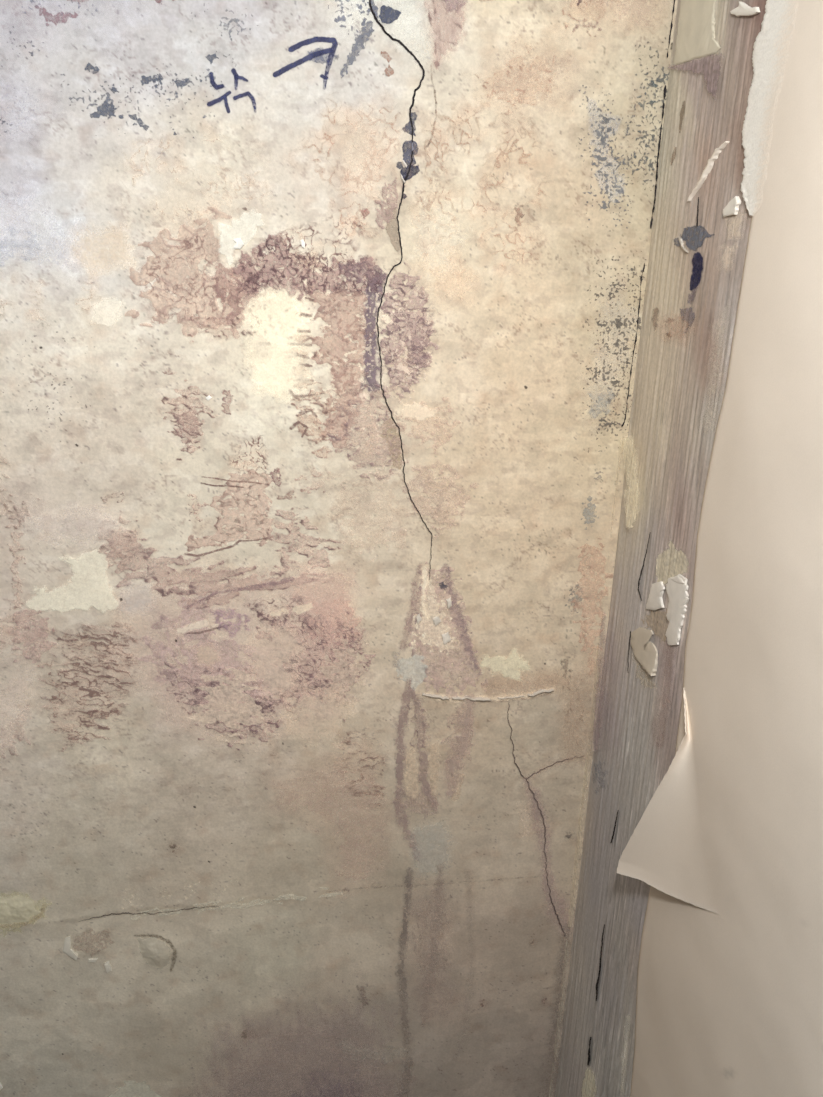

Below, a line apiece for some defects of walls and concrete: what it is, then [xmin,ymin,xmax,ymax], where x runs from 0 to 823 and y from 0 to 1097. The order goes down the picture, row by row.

damp [125,180,438,480]
crack [369,0,437,580]
peeling [631,574,689,676]
damp [393,680,474,1039]
crack [507,703,583,936]
crack [596,924,605,1001]